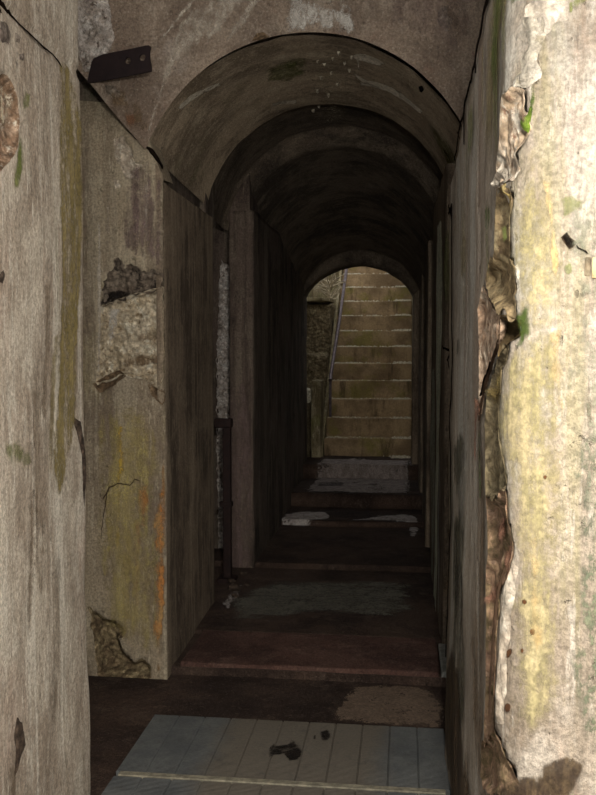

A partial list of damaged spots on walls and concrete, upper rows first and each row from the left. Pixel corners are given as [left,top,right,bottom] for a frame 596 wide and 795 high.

spalling [0,74,20,172]
crack [0,0,62,67]
crack [454,0,489,161]
spalling [93,257,165,405]
spalling [474,0,571,795]
crack [101,479,139,536]
rust [154,491,165,640]
damp [433,221,483,795]
spalling [88,607,151,679]
damp [489,757,582,795]